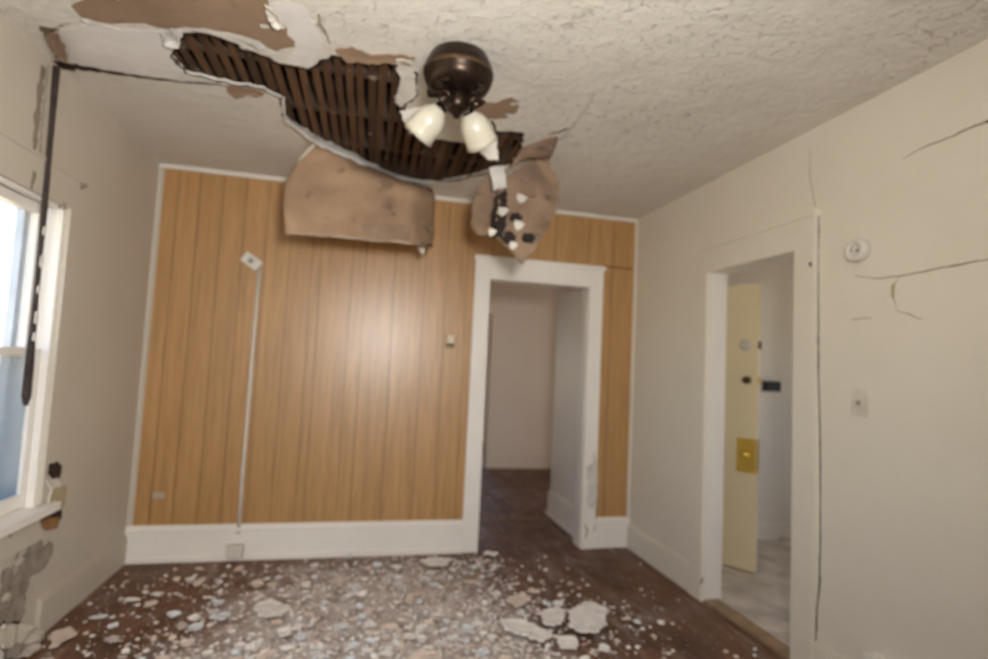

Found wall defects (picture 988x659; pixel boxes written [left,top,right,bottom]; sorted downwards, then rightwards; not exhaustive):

peeling [55,0,331,78]
peeling [475,97,525,121]
crack [903,119,988,159]
crack [855,259,988,320]
flaking render [0,461,67,627]
flaking render [0,642,40,659]